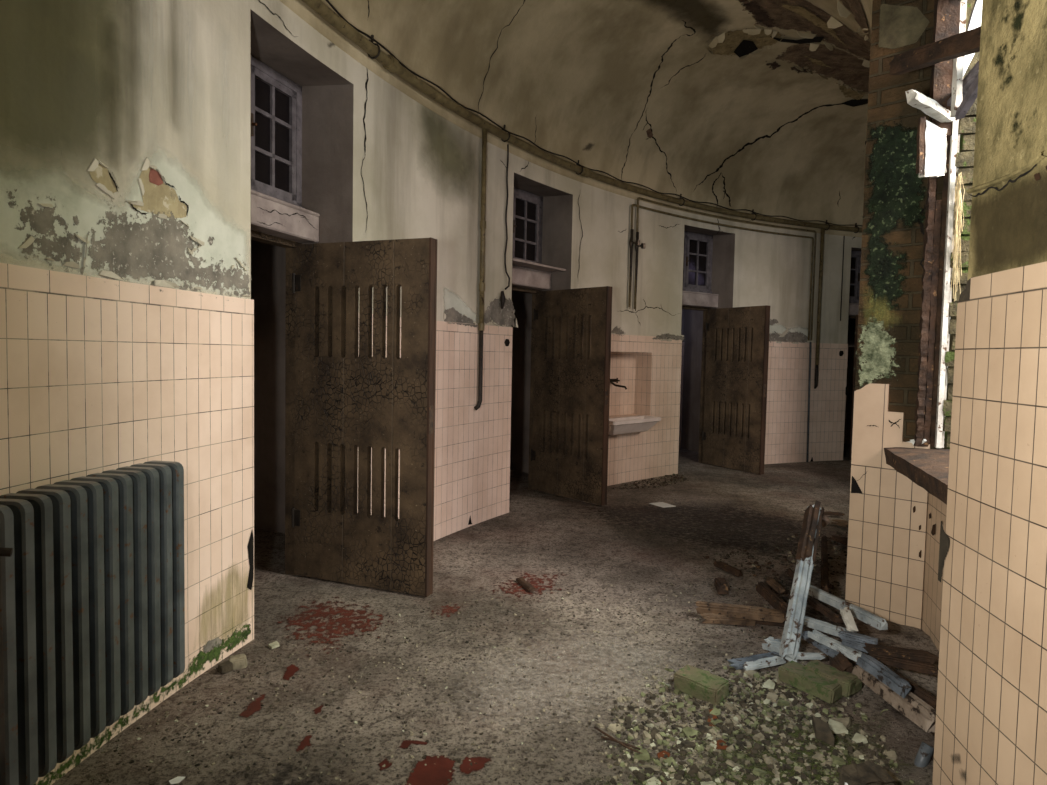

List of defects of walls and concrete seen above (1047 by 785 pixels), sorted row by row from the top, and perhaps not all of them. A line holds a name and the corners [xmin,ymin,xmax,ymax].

crack [478,0,525,112]
flaking render [706,0,871,100]
water stain [993,0,1026,85]
peeling [6,157,252,299]
crack [621,20,841,234]
crack [966,150,1047,197]